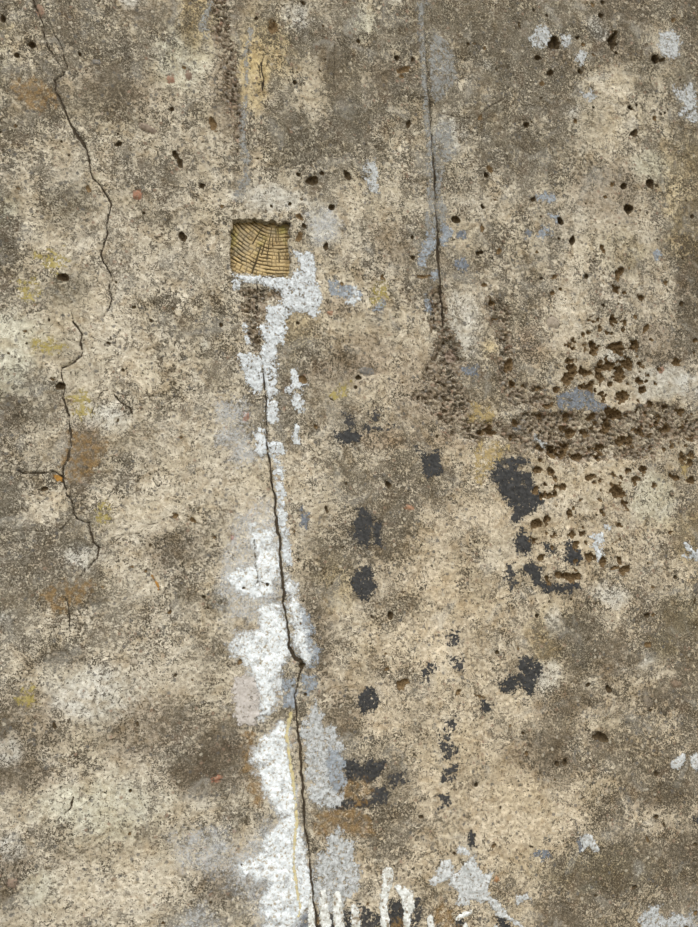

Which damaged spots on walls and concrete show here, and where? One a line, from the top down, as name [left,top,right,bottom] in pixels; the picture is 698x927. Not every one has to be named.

crack [33,0,113,319]
crack [416,71,516,328]
crack [4,298,173,572]
crack [92,385,204,418]
crack [254,373,318,927]